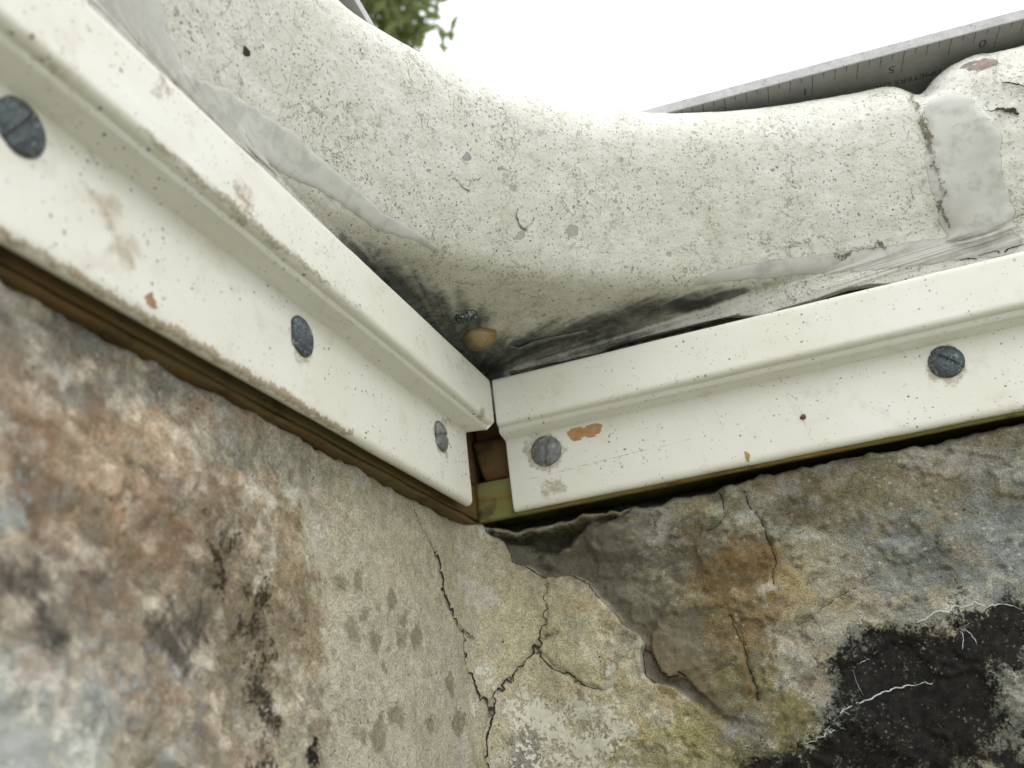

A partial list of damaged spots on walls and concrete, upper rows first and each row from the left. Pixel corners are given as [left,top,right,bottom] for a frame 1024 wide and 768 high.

spalling [960,58,999,71]
damp [342,238,747,387]
crack [706,491,777,585]
crack [416,515,607,768]
spalling [488,514,724,712]
crack [702,614,759,701]
damp [733,581,1024,768]